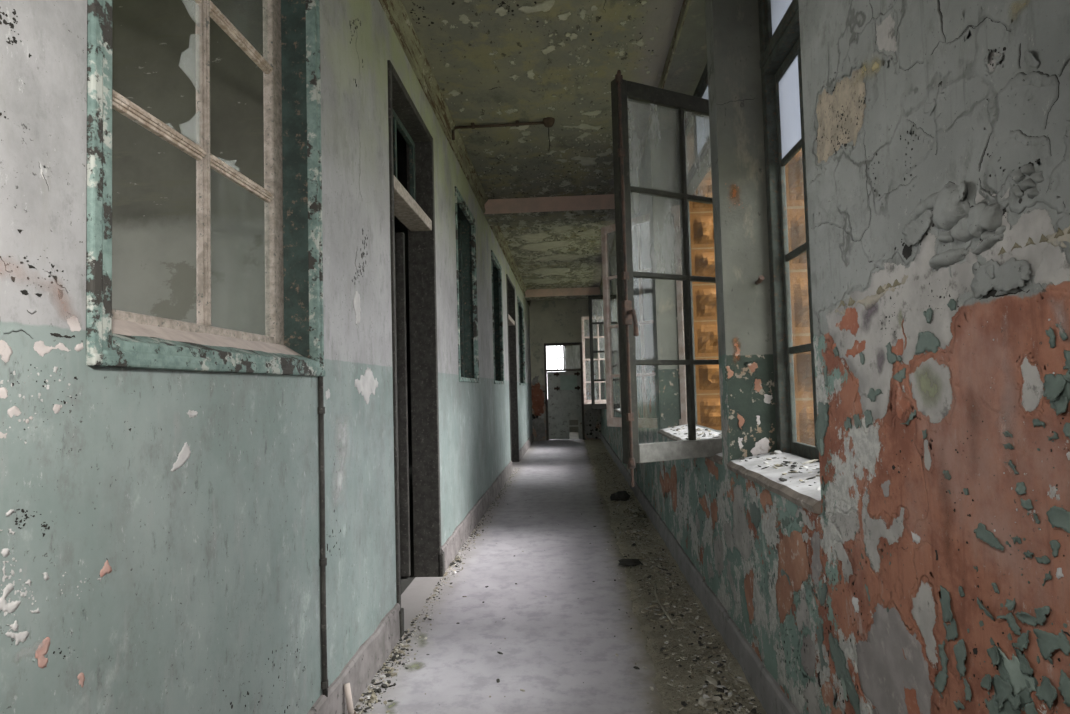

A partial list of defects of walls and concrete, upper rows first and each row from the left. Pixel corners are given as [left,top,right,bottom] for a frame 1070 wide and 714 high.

peeling [410,0,602,60]
crack [930,0,1070,77]
peeling [545,85,614,180]
spalling [809,0,926,189]
crack [811,81,948,270]
peeling [503,221,601,284]
peeling [813,158,1070,478]
peeling [724,358,773,404]
peeling [1003,443,1041,530]
flaking render [658,396,1000,714]
peeling [1005,535,1068,586]
peeling [996,606,1050,675]